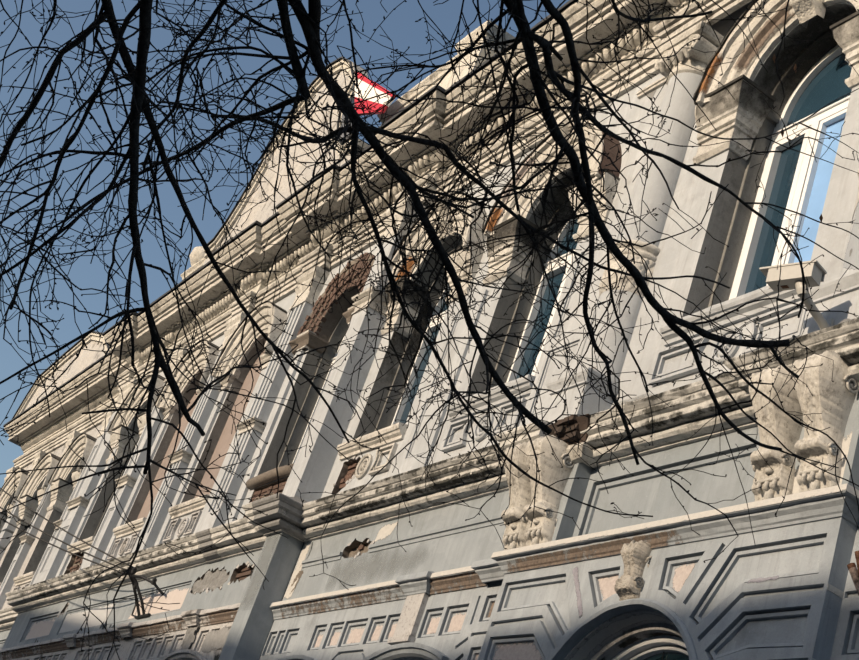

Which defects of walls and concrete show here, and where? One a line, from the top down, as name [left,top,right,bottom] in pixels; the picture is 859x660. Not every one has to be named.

leakage [624,318,859,430]
leakage [315,443,505,521]
flaking render [228,561,253,585]
peeling [271,544,398,607]
peeling [348,522,397,559]
peeling [430,566,474,578]
peeling [491,483,859,560]